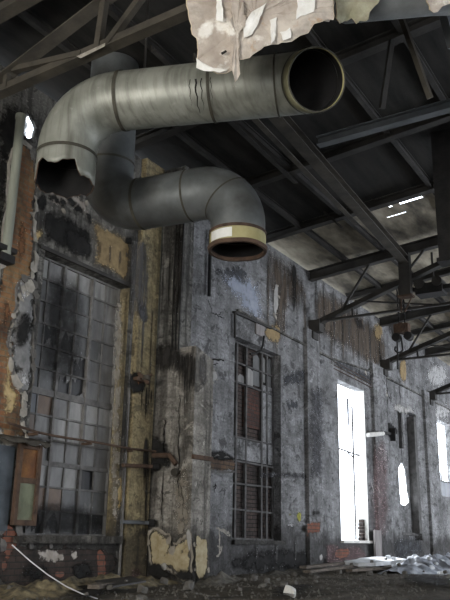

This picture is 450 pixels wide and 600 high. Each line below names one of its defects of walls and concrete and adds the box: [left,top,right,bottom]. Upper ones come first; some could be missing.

peeling [196,0,266,81]
peeling [270,17,291,43]
peeling [296,0,315,19]
flaking render [0,140,41,446]
water stain [316,281,385,367]
crack [161,395,184,530]
flaking render [0,523,119,586]
peeling [147,527,210,581]